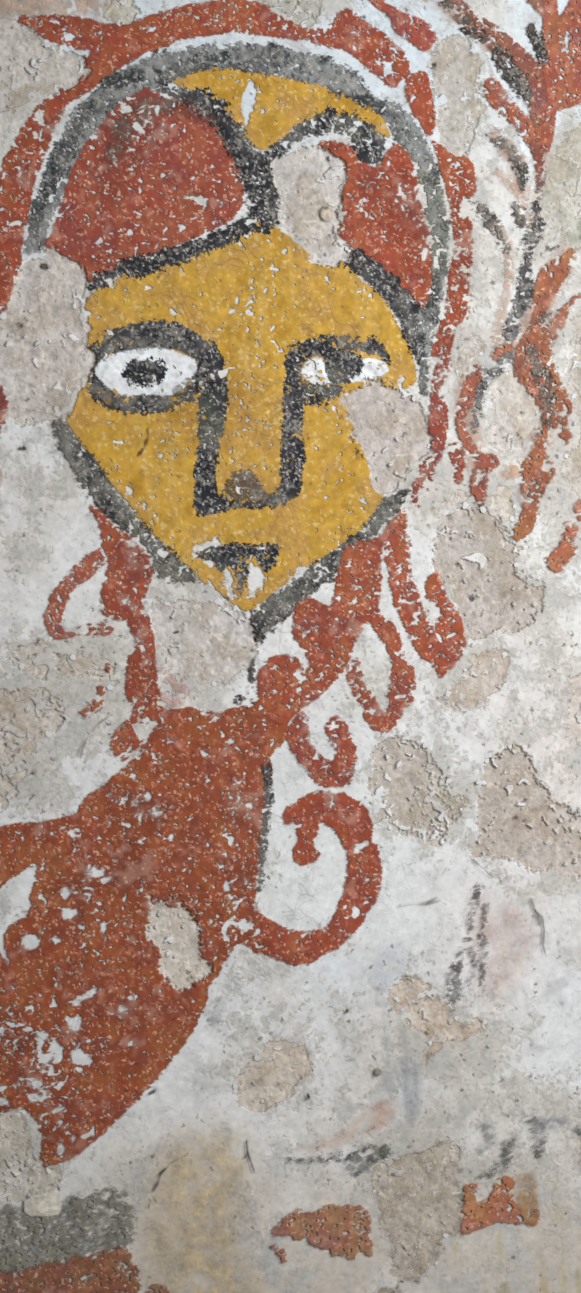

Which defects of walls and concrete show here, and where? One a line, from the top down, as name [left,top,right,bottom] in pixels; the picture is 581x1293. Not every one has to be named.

flaking render [269,145,353,269]
flaking render [338,377,435,494]
flaking render [430,485,545,711]
flaking render [365,735,581,879]
flaking render [144,894,213,991]
flaking render [232,1040,316,1112]
flaking render [388,975,487,1067]
flaking render [369,1140,467,1293]